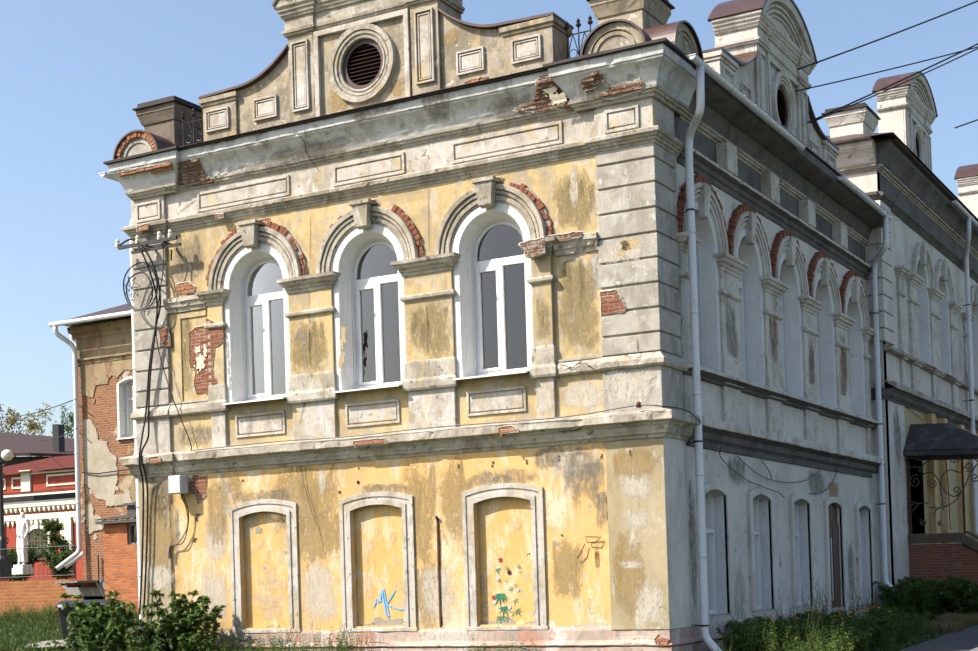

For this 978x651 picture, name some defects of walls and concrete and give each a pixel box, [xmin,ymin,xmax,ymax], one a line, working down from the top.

flaking render [512,74,575,113]
flaking render [579,71,646,100]
flaking render [116,132,156,159]
flaking render [117,158,215,188]
leakage [556,172,593,227]
leakage [561,261,595,344]
flaking render [590,254,627,316]
flaking render [189,318,231,395]
peeling [81,418,136,540]
leakage [537,448,607,522]
leakage [365,461,532,645]
leakage [552,542,583,596]